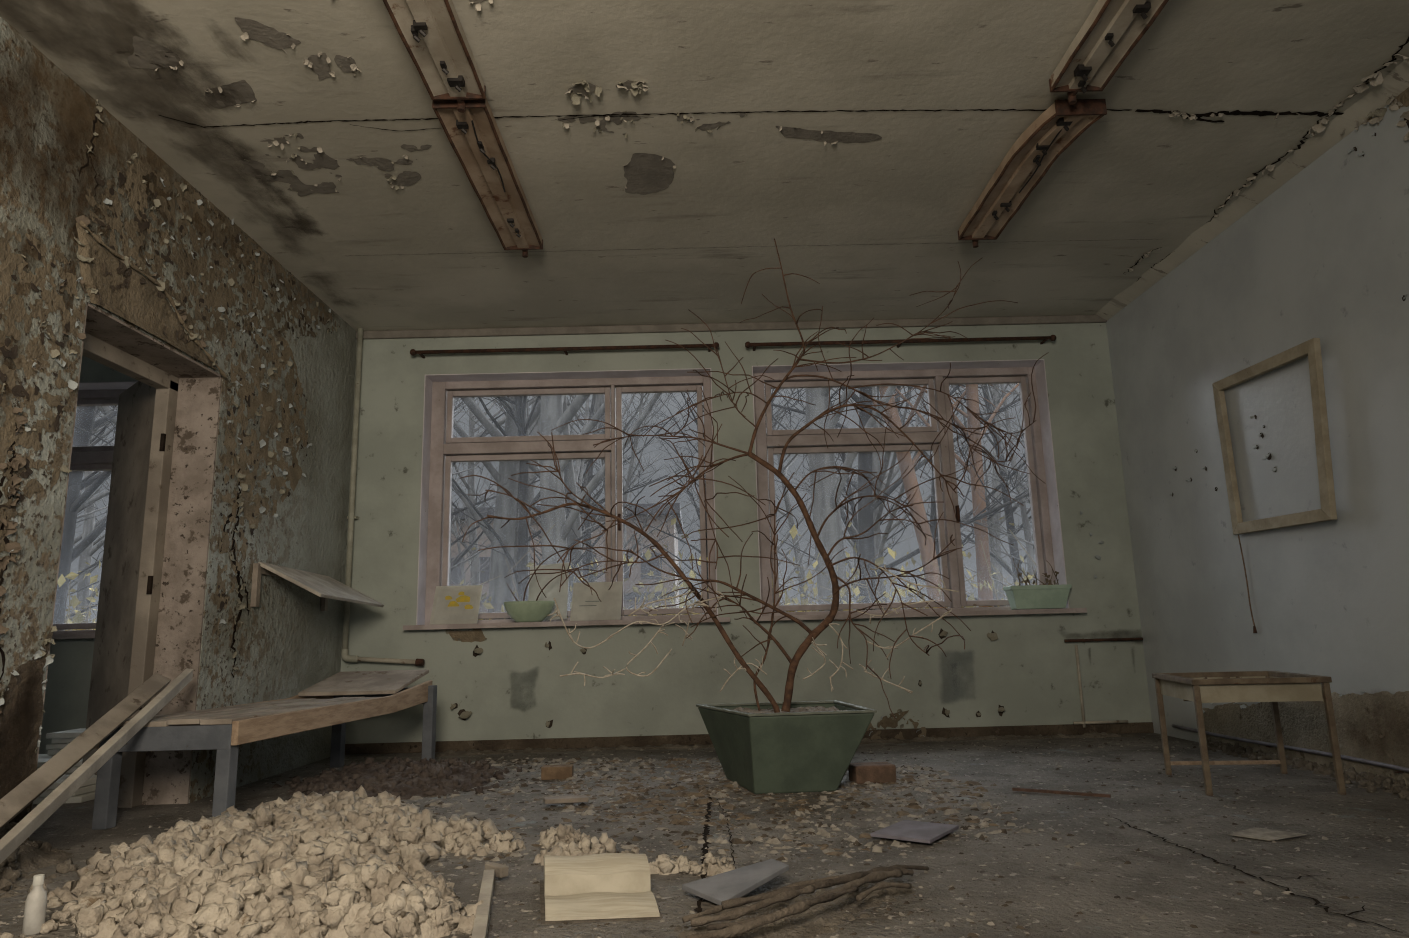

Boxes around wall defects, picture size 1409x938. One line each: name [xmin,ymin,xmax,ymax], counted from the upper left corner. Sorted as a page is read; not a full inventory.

leakage [0,66,105,238]
leakage [0,0,248,180]
peeling [235,17,361,80]
crack [159,115,439,131]
peeling [239,133,432,196]
crack [494,109,1047,120]
crack [1107,37,1409,222]
peeling [0,153,345,626]
peeling [0,626,57,799]
peeling [1202,691,1409,786]
crack [694,797,746,925]
crack [1115,818,1403,933]